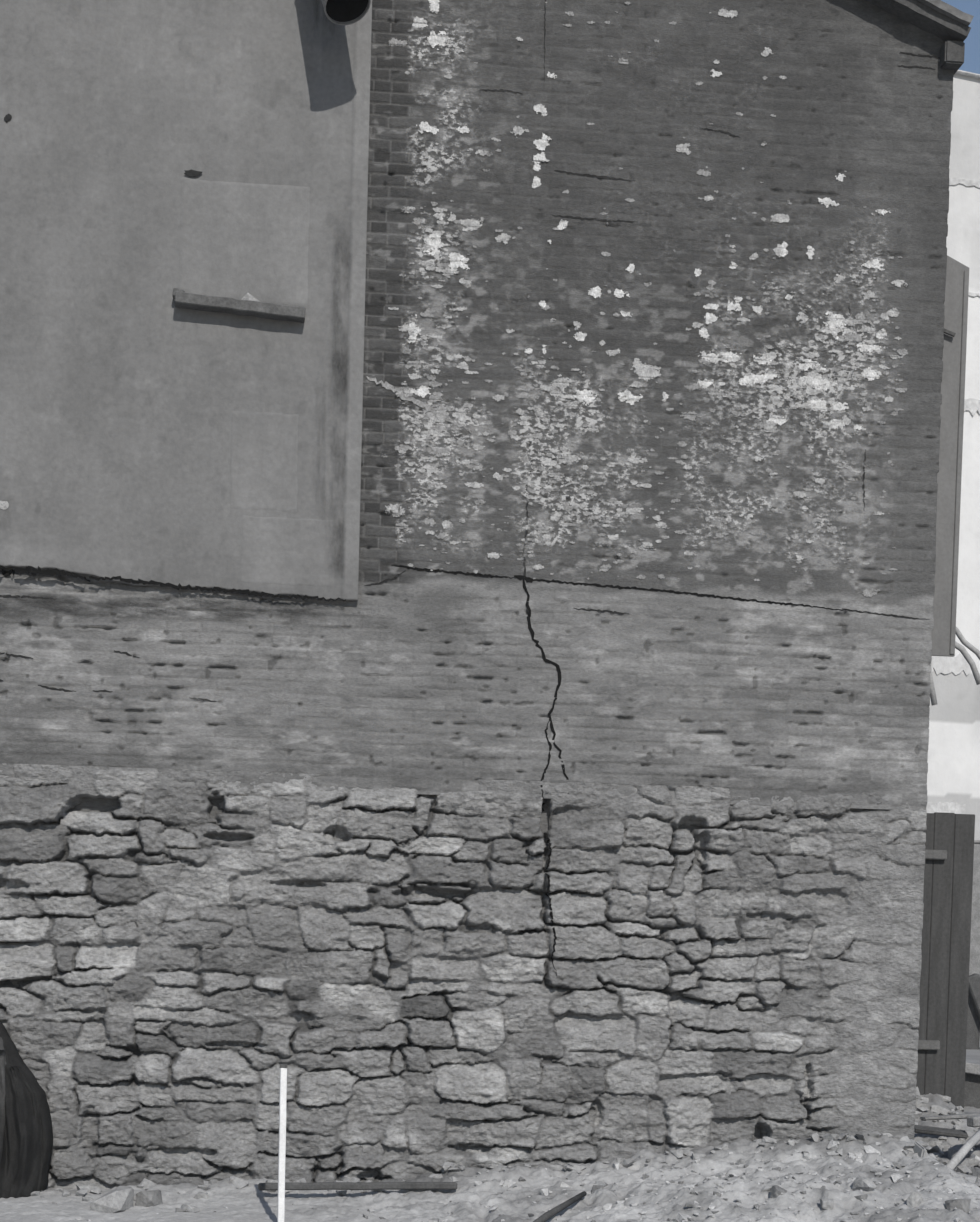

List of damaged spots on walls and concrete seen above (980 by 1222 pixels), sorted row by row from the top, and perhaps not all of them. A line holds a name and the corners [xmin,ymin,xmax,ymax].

peeling [381,0,908,585]
crack [0,434,930,976]